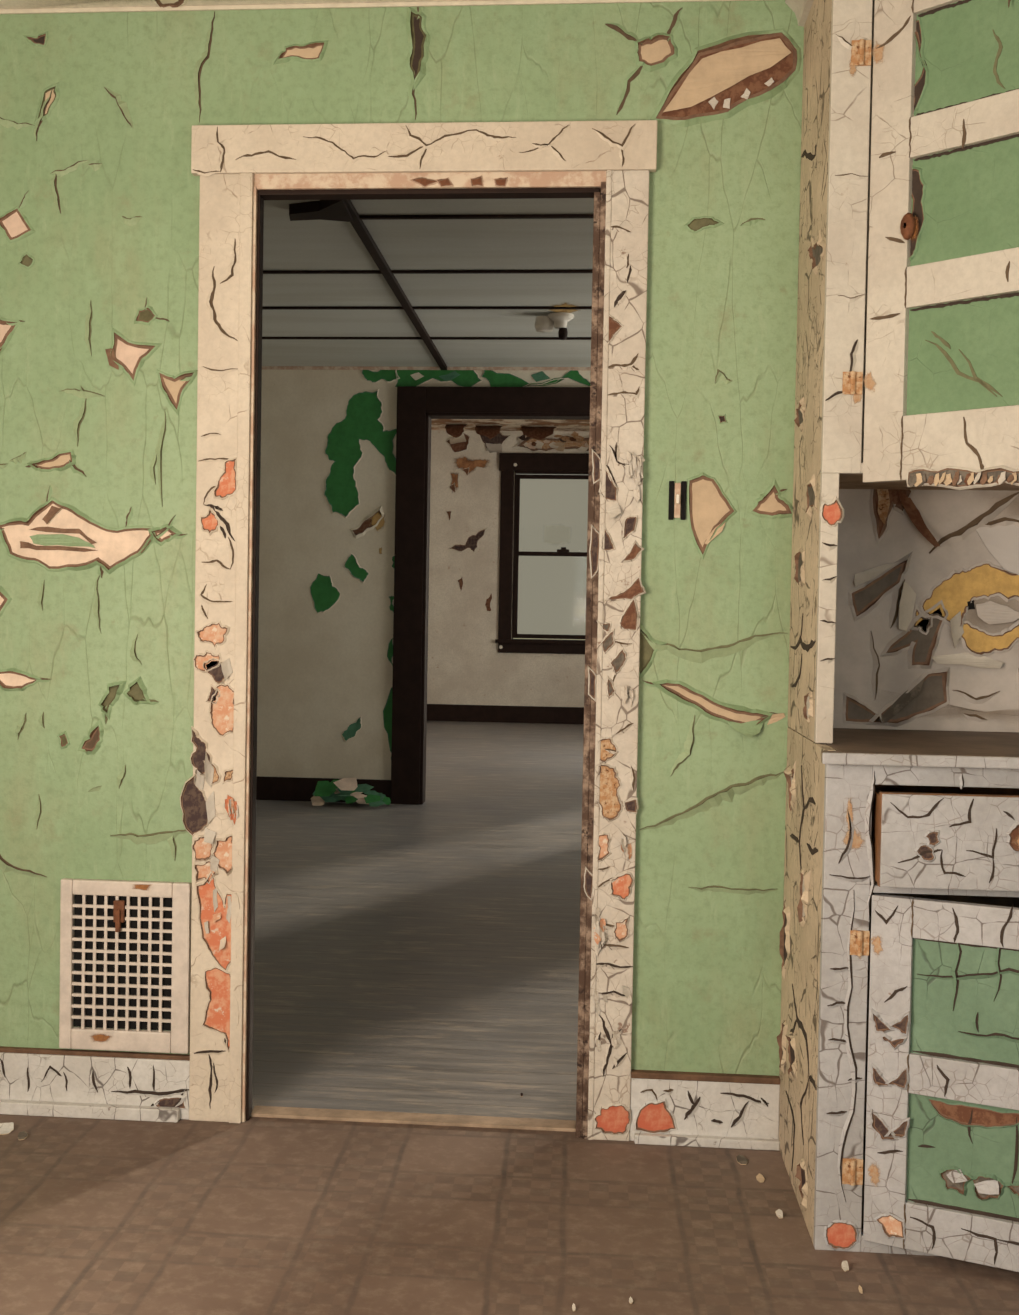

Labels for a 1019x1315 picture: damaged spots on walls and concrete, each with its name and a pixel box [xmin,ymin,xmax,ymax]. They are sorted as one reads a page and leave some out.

peeling [273,40,328,65]
crack [193,11,636,177]
peeling [605,8,802,127]
peeling [105,297,198,415]
peeling [0,449,237,578]
peeling [324,370,590,583]
peeling [445,421,645,579]
peeling [686,472,793,559]
peeling [310,573,341,614]
peeling [588,576,785,738]
peeling [180,621,240,1052]
peeling [593,1089,678,1135]